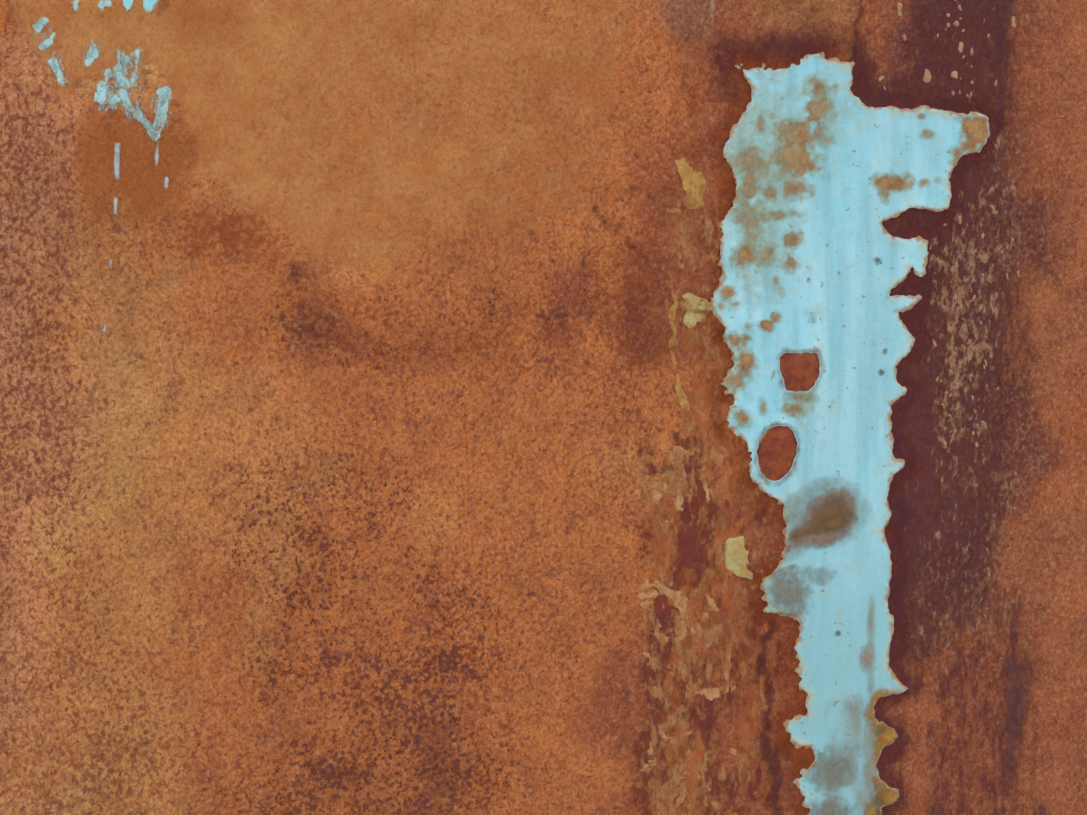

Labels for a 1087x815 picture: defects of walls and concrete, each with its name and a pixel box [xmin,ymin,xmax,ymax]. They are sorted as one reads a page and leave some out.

peeling [32,17,69,86]
peeling [97,0,160,13]
peeling [84,40,174,142]
rust [937,0,974,98]
rust [873,174,929,201]
rust [633,76,837,815]
peeling [704,44,999,815]
rust [889,113,1031,815]
rust [788,484,856,550]
rust [224,454,549,815]
rust [851,691,898,815]
rust [811,802,849,815]